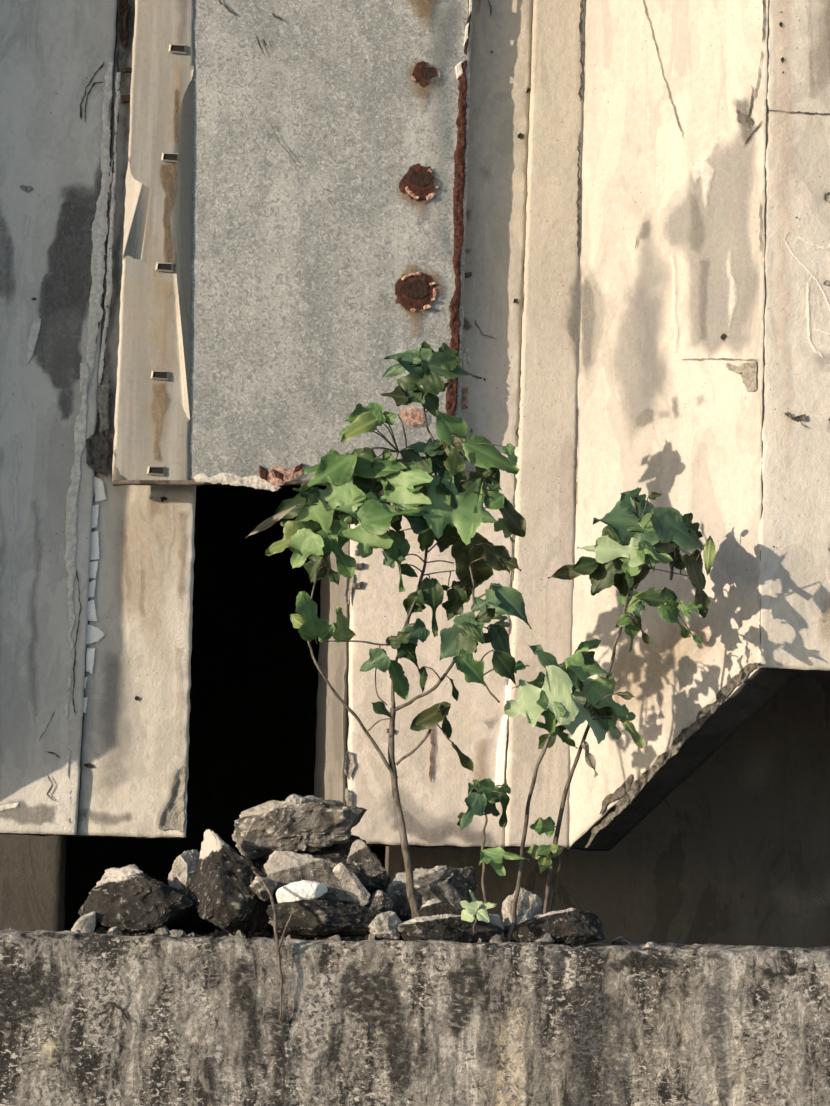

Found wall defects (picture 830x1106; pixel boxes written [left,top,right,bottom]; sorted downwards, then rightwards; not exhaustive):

crack [753,0,830,115]
peeling [27,319,41,364]
water stain [33,170,102,418]
corrosion [395,0,496,416]
crack [756,202,764,251]
peeling [64,61,121,799]
corrosion [400,407,424,426]
water stain [77,958,128,1057]
water stain [225,959,285,1106]
water stain [301,963,438,1104]
water stain [497,1007,526,1106]
water stain [750,966,804,1106]